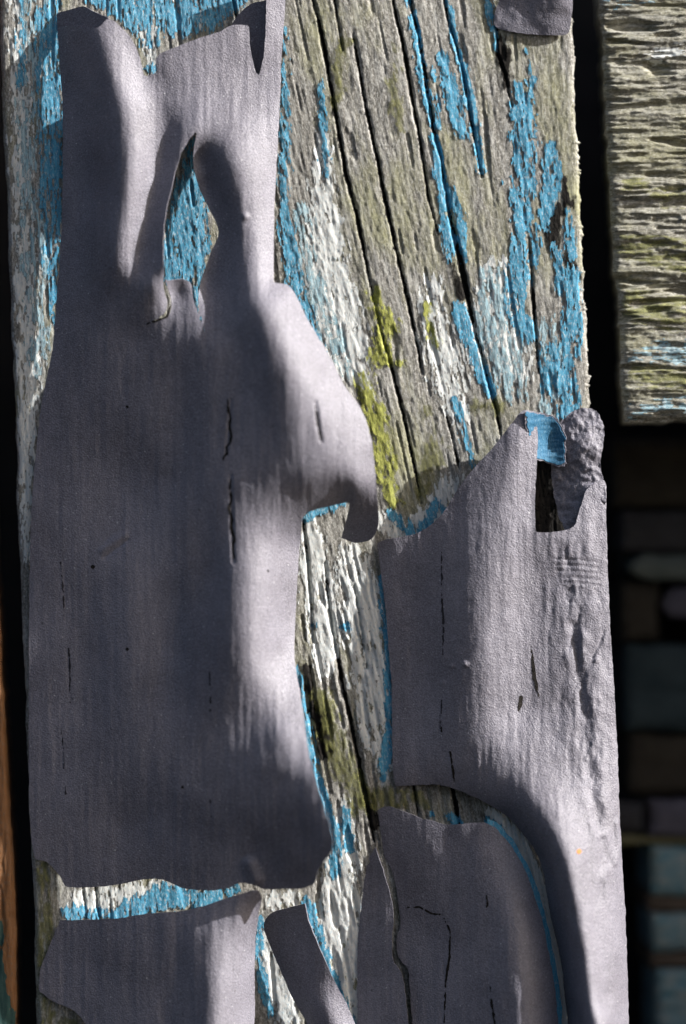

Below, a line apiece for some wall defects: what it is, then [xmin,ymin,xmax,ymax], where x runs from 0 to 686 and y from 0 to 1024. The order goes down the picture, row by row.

peeling [163,137,212,286]
crack [222,398,236,559]
crack [312,0,376,307]
crack [353,38,421,366]
crack [382,332,419,492]
peeling [405,0,487,264]
crack [392,0,501,433]
peeling [417,60,563,469]
peeling [537,241,584,419]
peeling [39,890,274,1024]
peeling [258,925,301,1024]
crack [407,906,451,1023]